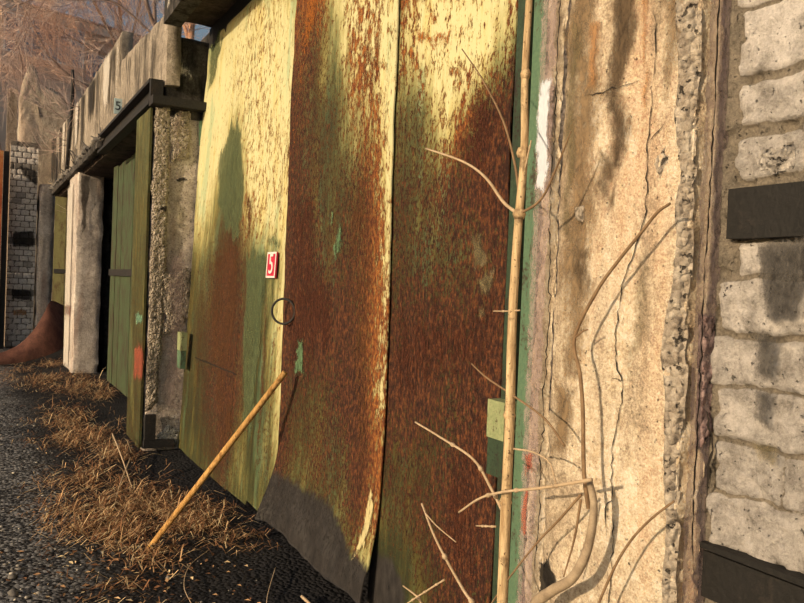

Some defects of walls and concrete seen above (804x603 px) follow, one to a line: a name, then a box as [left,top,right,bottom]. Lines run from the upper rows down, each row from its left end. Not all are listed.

damp [51,43,118,181]
rust [412,8,452,51]
damp [516,0,557,603]
crack [534,0,561,575]
damp [553,386,571,450]
damp [559,0,636,377]
crack [586,13,665,603]